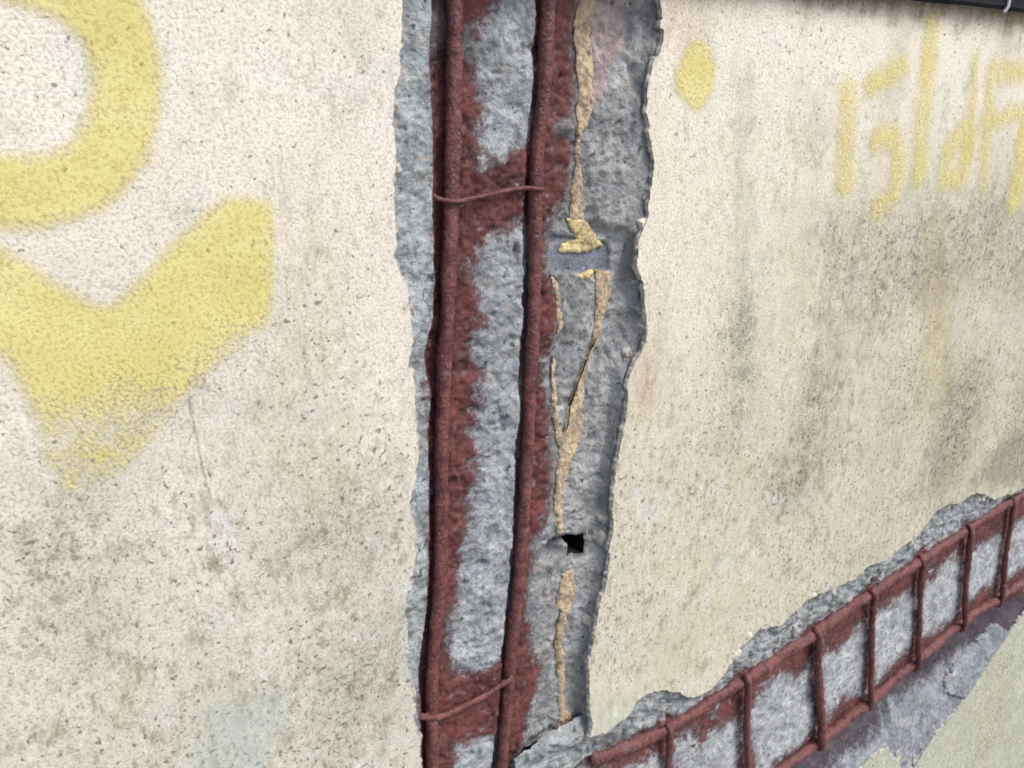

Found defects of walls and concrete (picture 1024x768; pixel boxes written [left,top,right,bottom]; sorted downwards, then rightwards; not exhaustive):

spalling [392,0,447,768]
corrosion [415,0,579,768]
crack [565,336,598,434]
spalling [439,0,1024,768]
corrosion [580,493,1024,768]